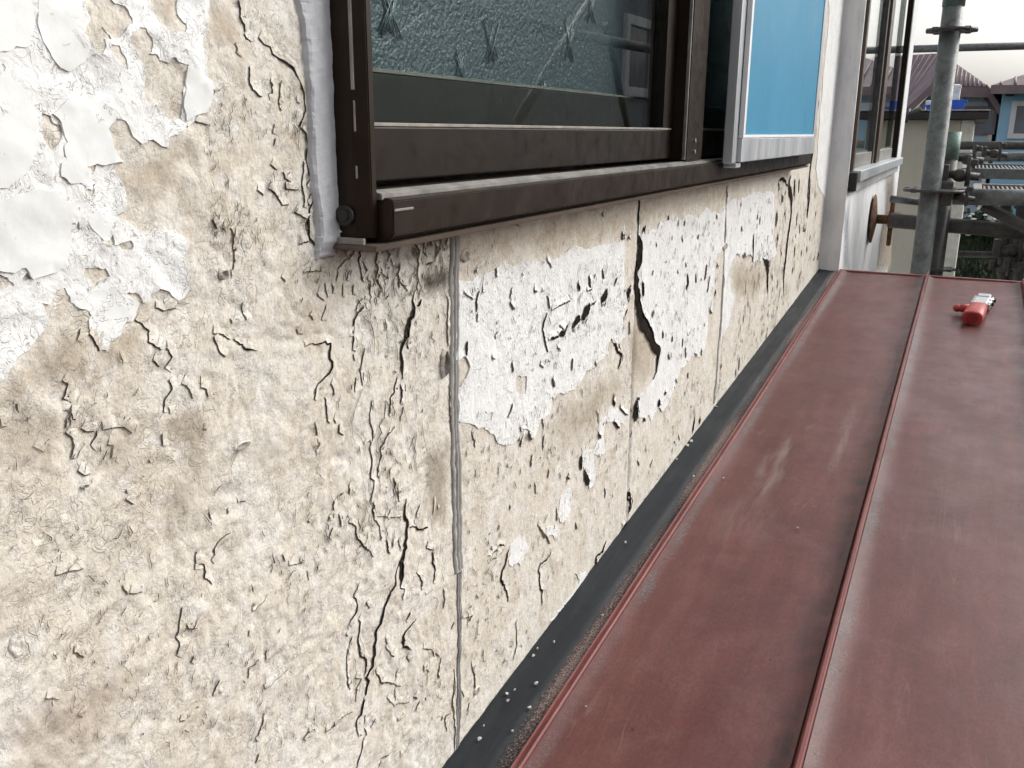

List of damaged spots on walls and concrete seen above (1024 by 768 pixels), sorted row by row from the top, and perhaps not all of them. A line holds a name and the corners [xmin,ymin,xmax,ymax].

crack [0,329,144,554]
peeling [0,0,215,382]
crack [24,0,820,768]
peeling [440,240,628,445]
peeling [581,191,777,489]